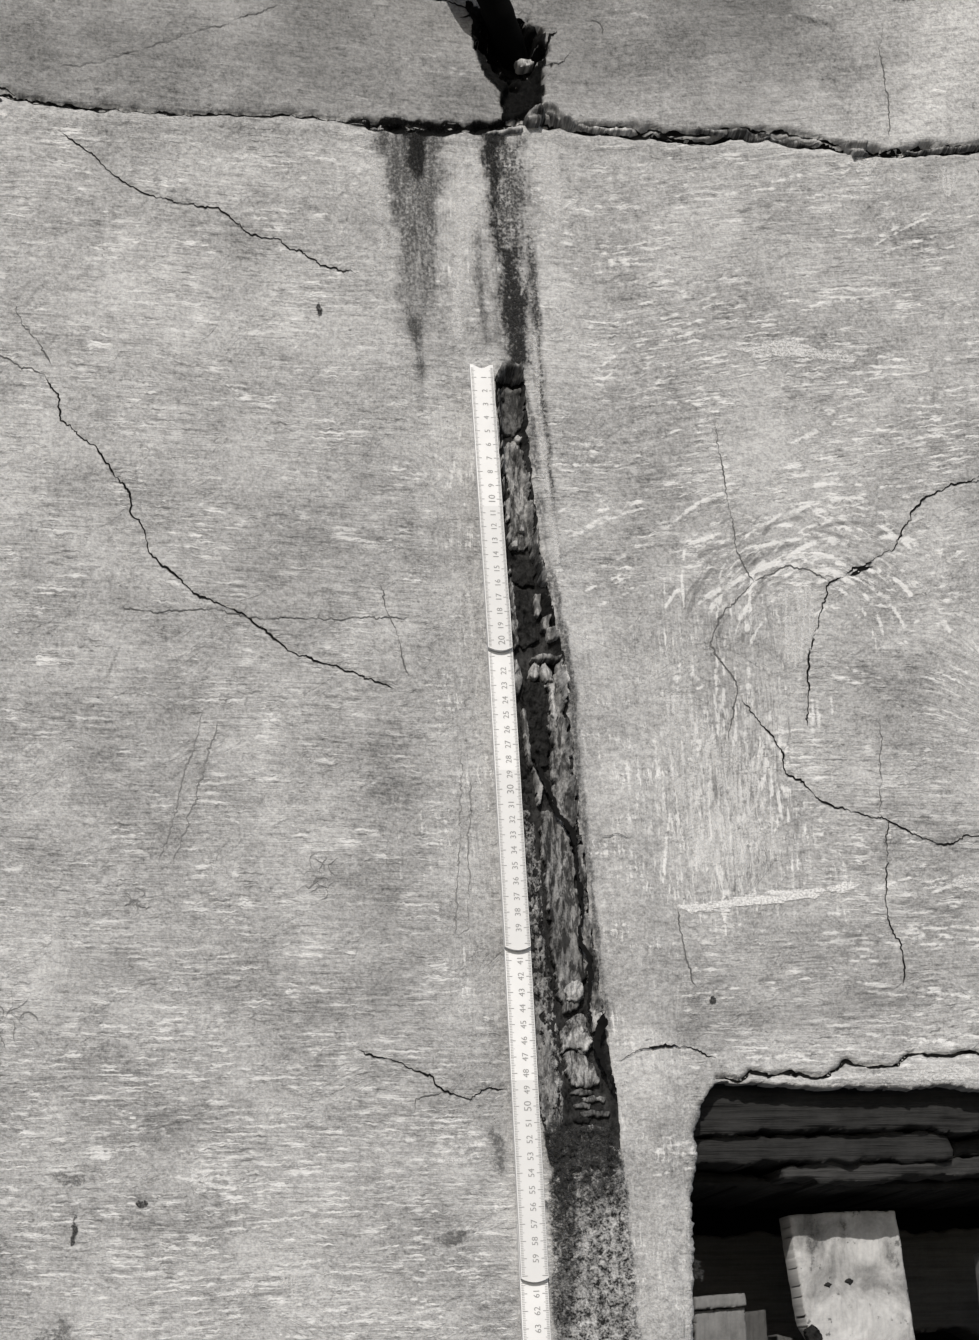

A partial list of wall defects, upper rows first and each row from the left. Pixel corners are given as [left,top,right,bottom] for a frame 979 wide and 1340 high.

crack [0,3,979,272]
crack [0,312,409,689]
leakage [373,117,562,564]
crack [710,427,979,983]
crack [358,1049,507,1112]
crack [537,762,979,1093]